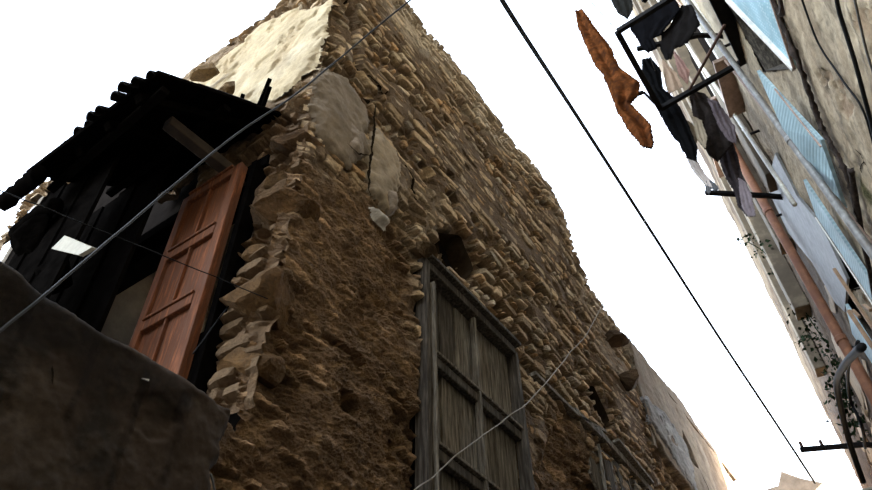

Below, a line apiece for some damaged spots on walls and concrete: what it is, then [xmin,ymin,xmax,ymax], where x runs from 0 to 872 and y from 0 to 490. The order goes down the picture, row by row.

spalling [183,0,339,80]
crack [350,69,388,202]
crack [400,154,418,212]
spalling [210,67,421,490]
spalling [534,407,595,490]